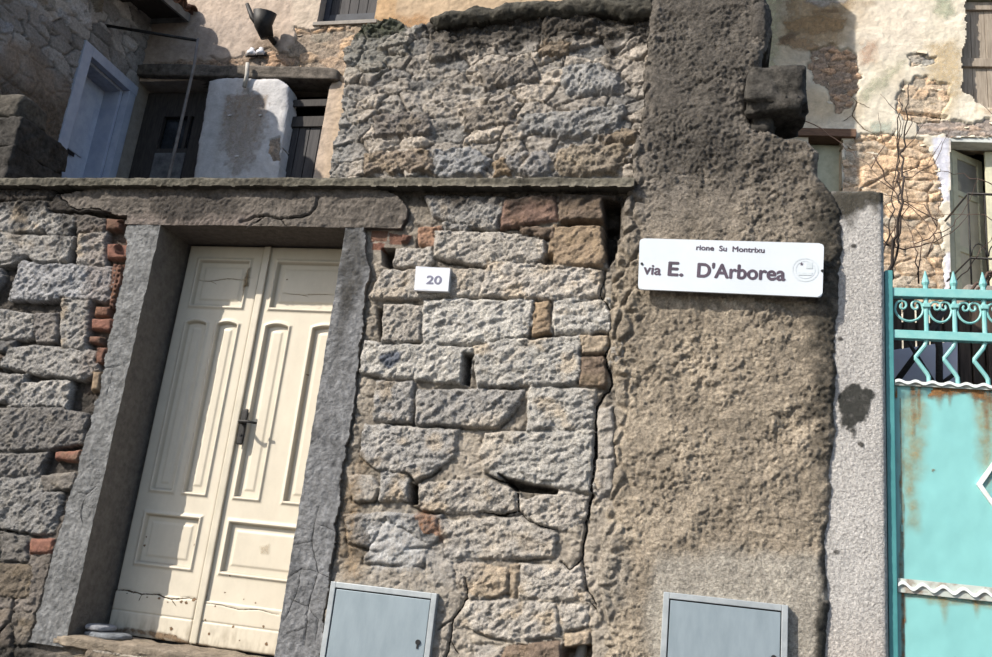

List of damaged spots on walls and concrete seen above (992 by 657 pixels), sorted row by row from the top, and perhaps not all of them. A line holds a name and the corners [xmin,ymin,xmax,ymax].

spalling [161,25,363,83]
spalling [808,44,861,114]
crack [245,199,319,228]
spalling [842,49,992,313]
water stain [838,383,875,447]
rust [911,387,992,413]
crack [487,475,556,530]
crack [563,348,613,610]
crack [113,514,333,644]
crack [439,581,469,657]